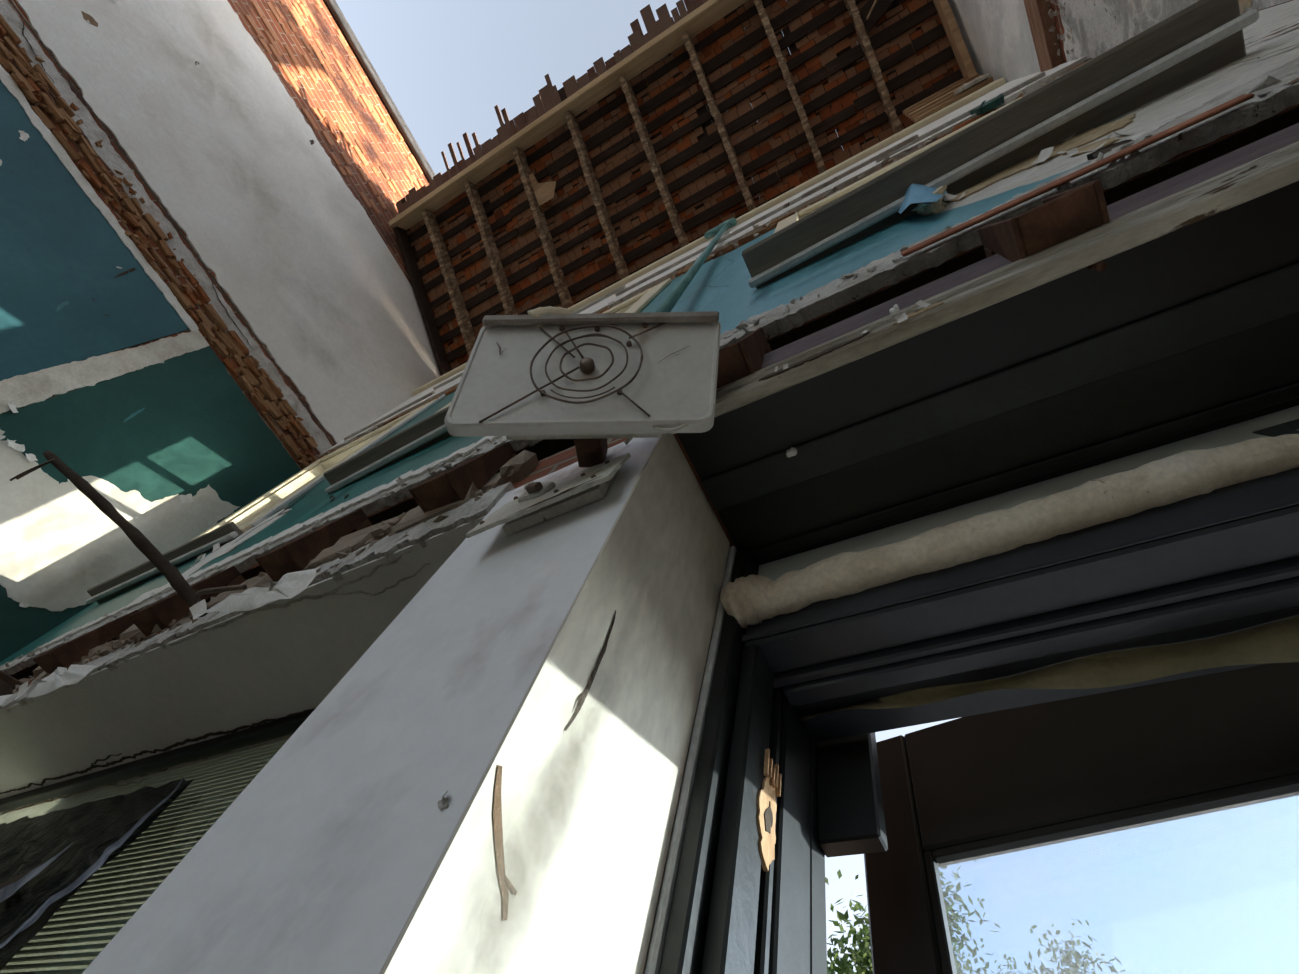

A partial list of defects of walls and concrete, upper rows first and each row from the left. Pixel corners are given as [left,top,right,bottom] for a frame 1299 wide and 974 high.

spalling [81,11,98,27]
flaking render [916,0,1299,216]
peeling [0,330,209,414]
peeling [0,430,239,612]
peeling [189,568,322,620]
peeling [0,665,96,705]
crack [565,610,616,731]